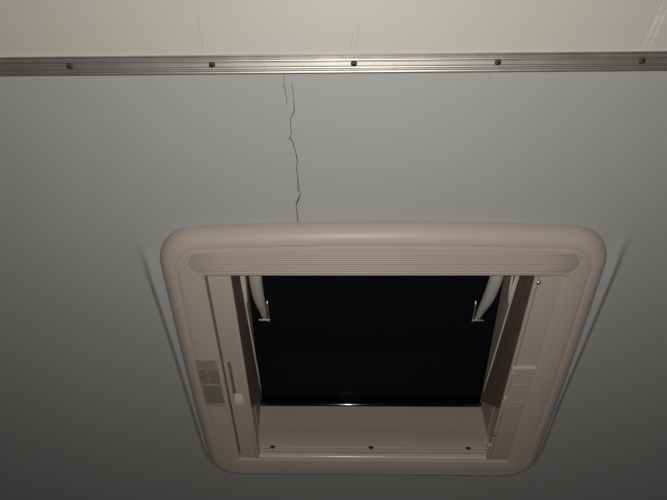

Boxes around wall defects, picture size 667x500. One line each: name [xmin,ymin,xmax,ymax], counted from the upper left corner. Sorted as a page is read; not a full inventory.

crack [284,86,301,220]